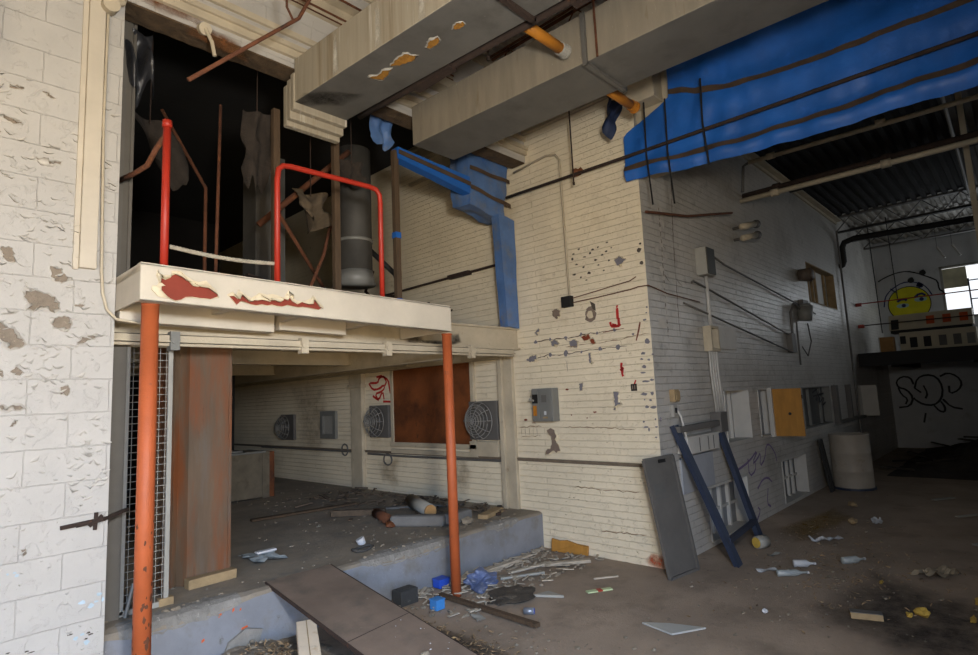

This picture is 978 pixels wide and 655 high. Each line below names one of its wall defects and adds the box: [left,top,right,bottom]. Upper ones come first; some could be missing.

peeling [0,73,32,101]
peeling [0,108,27,142]
peeling [0,133,83,181]
peeling [151,269,323,310]
peeling [0,185,116,445]
peeling [29,414,112,506]